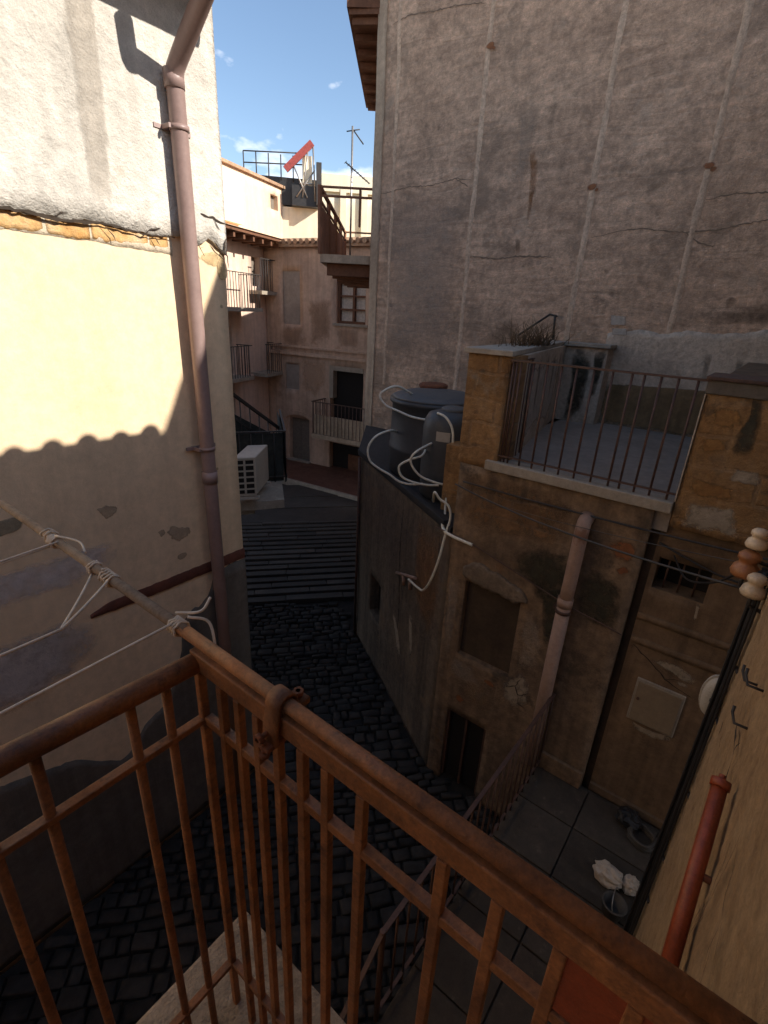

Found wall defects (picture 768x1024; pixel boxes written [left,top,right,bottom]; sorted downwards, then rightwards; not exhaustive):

crack [394,2,484,24]
crack [381,178,470,194]
flaking render [0,209,173,256]
crack [594,219,768,247]
crack [473,253,548,261]
damp [565,350,705,435]
damp [734,399,761,454]
damp [517,552,566,642]